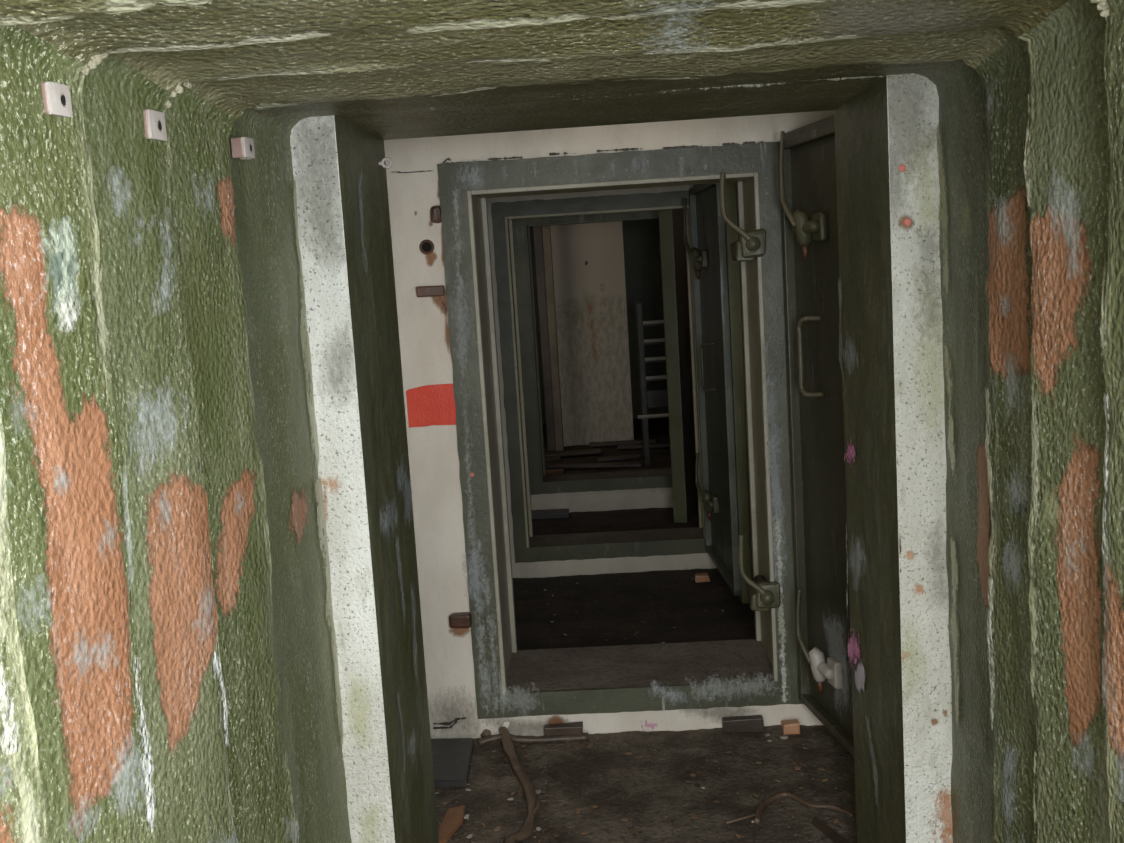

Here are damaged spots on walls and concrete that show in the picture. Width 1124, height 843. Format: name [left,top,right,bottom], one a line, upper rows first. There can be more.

rust [432,289,450,349]